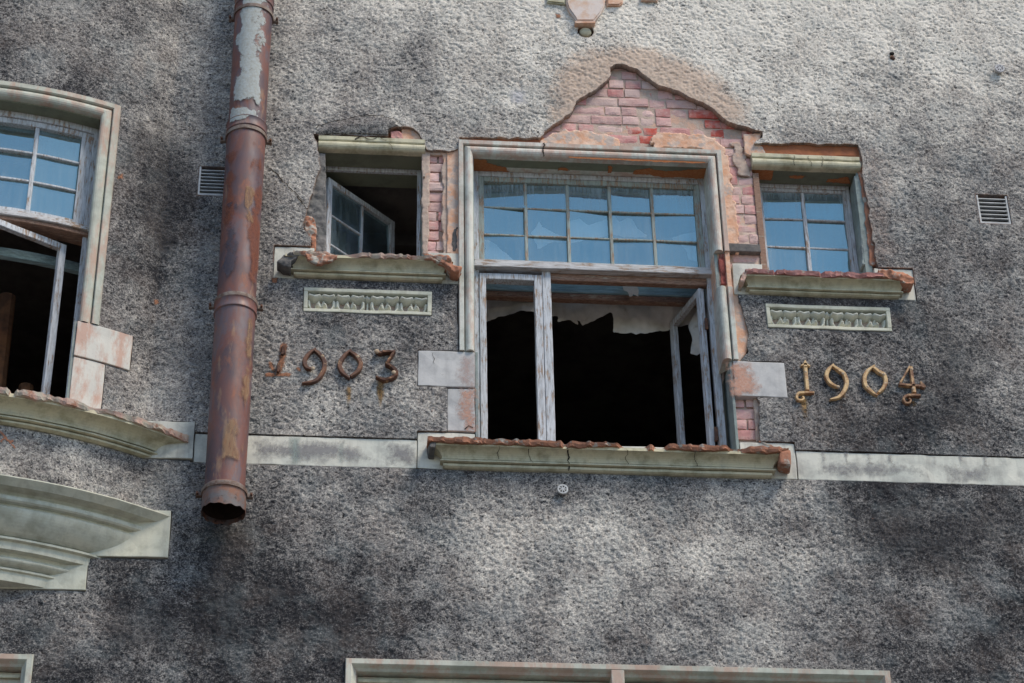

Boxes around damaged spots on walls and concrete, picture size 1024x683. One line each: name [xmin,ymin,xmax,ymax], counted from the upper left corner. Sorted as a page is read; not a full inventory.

spalling [427,359,624,459]
flaking render [465,69,914,474]